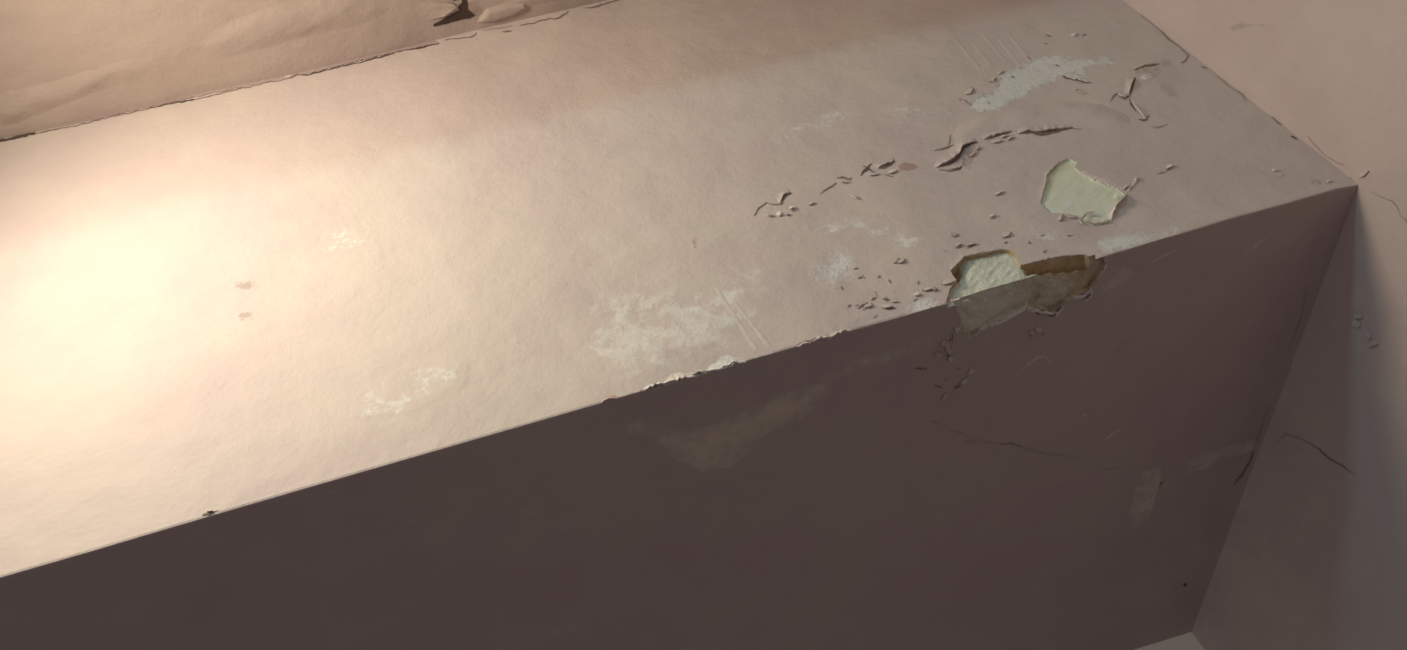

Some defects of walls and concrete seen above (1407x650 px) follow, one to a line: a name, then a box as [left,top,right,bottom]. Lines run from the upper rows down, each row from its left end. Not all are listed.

crack [0,0,617,142]
crack [1110,10,1246,128]
crack [1274,118,1407,222]
spalling [841,155,1138,402]
crack [1234,406,1356,485]